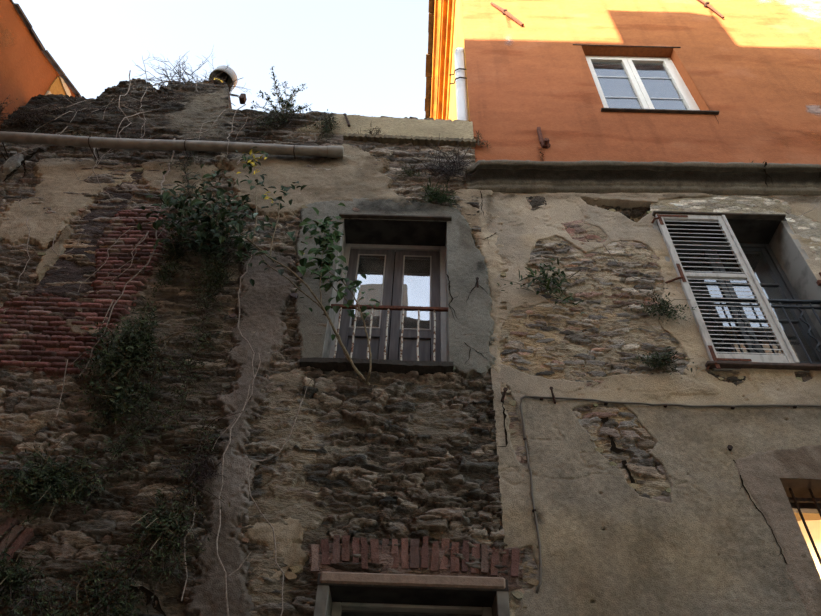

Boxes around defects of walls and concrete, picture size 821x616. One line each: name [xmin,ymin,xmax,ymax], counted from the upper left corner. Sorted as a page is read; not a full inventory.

peeling [784,0,821,19]
peeling [0,144,435,281]
spalling [594,194,821,268]
peeling [64,308,99,336]
spalling [452,188,746,393]
crack [498,401,508,447]
spalling [573,404,671,503]
crack [733,460,788,565]